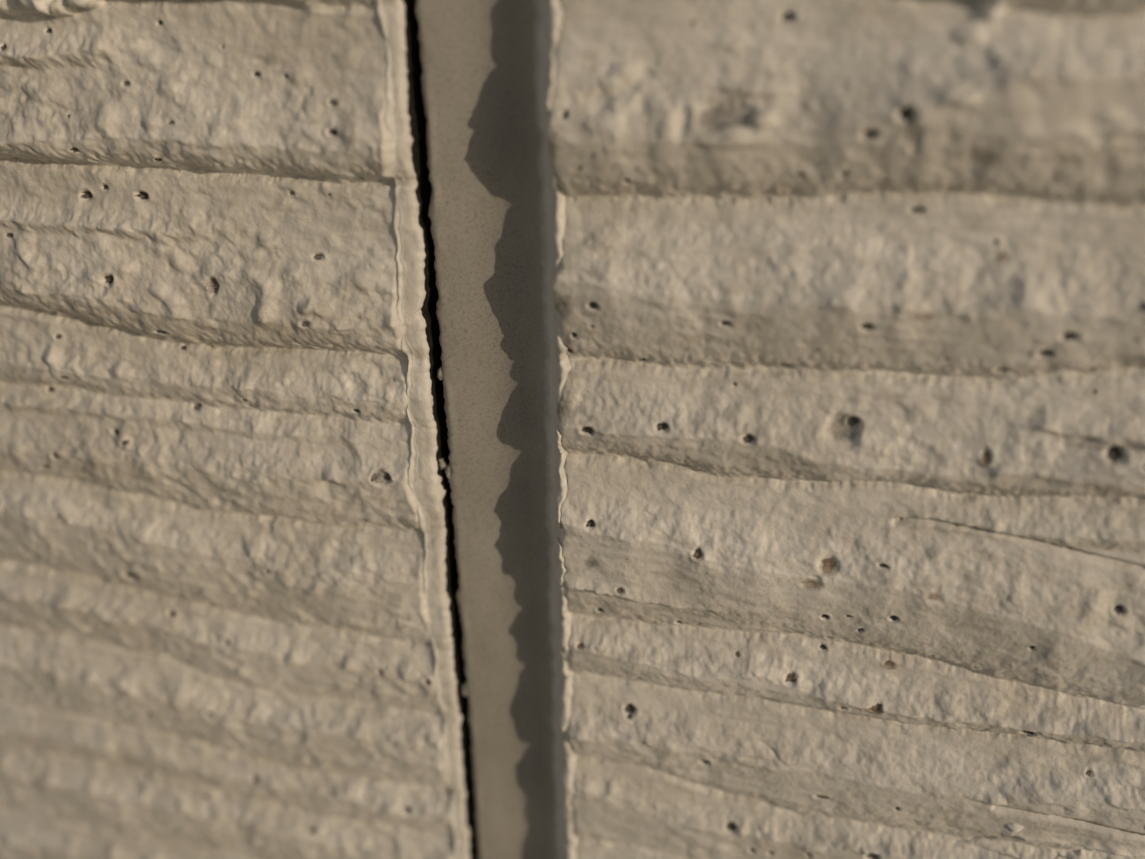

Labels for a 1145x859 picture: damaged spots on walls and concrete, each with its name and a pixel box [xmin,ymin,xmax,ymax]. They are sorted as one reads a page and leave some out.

crack [403,0,479,859]
crack [896,518,1144,567]